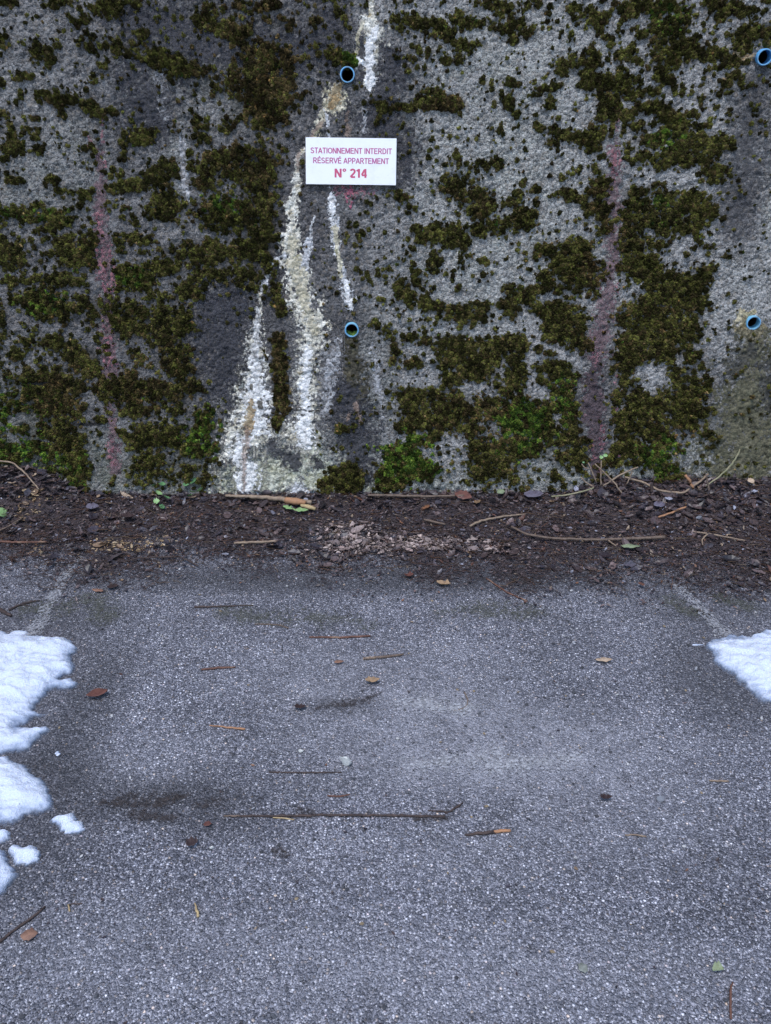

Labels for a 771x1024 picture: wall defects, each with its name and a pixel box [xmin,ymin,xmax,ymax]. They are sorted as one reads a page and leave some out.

damp [95,0,426,498]